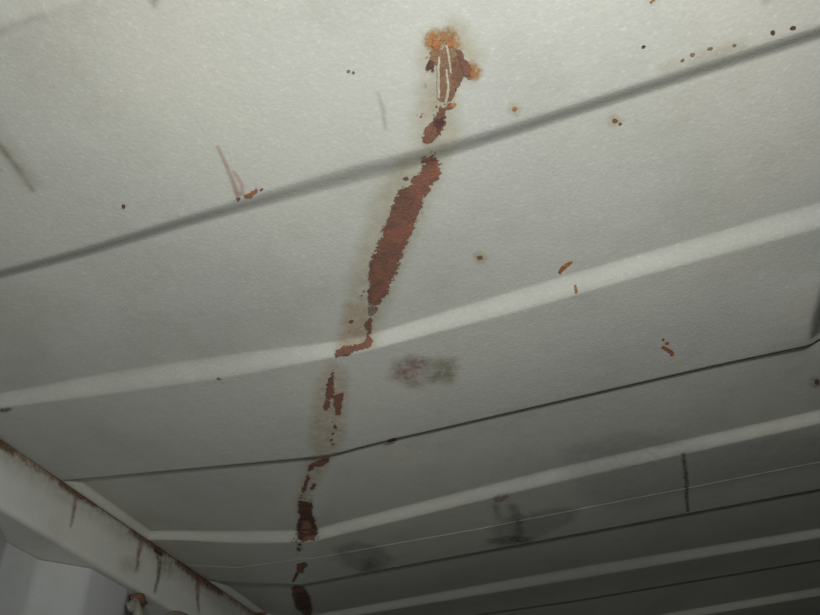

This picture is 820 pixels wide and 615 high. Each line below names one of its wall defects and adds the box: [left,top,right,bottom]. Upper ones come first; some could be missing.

rust [0,440,267,615]